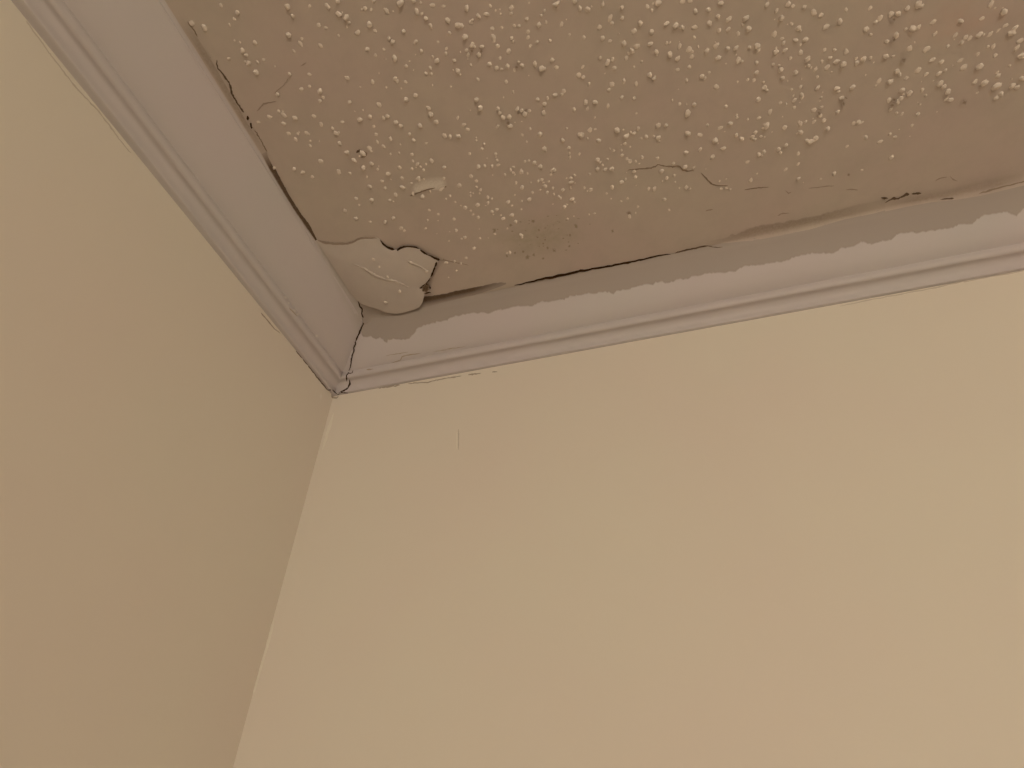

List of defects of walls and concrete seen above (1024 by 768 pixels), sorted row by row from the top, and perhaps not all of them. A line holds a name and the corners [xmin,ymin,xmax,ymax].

crack [216,62,306,151]
crack [380,240,469,294]
crack [517,245,720,285]
crack [261,302,364,395]